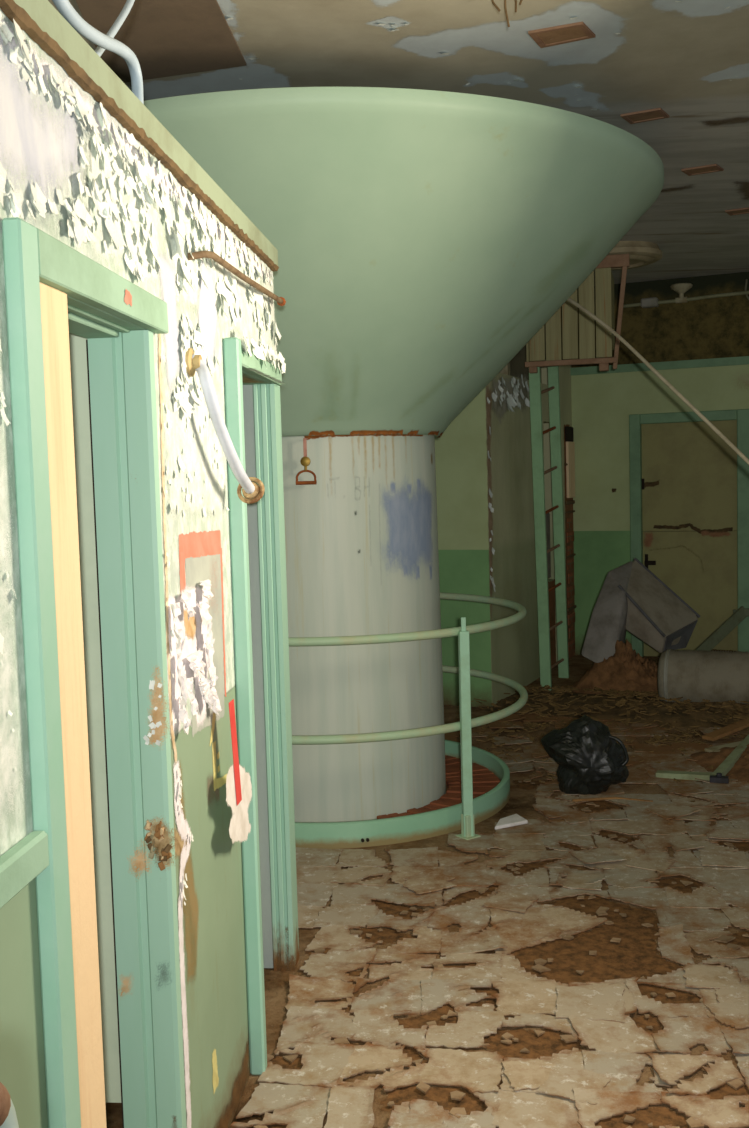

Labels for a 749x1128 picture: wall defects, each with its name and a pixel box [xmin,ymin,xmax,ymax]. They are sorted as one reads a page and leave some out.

peeling [126,0,292,101]
peeling [364,0,631,67]
flaking render [0,12,286,422]
corrosion [304,429,444,494]
crack [650,523,733,571]
spalling [127,815,187,881]
peeling [350,885,499,945]
peeling [511,895,703,1004]
peeling [394,987,499,1030]
peeling [484,1029,584,1061]
peeling [379,1081,487,1118]
peeling [595,1106,705,1128]